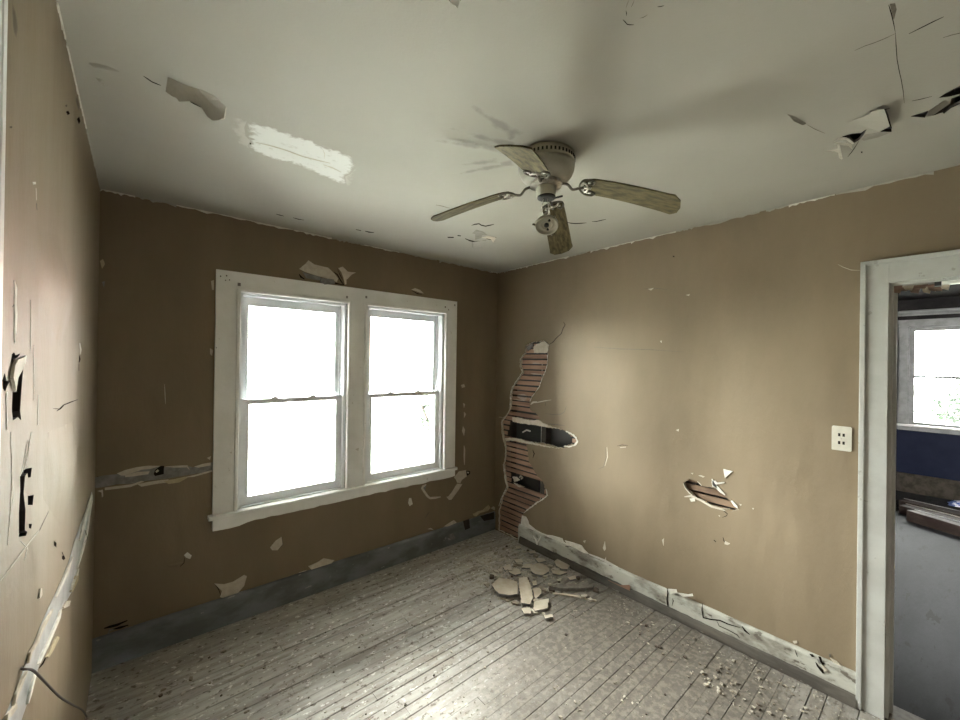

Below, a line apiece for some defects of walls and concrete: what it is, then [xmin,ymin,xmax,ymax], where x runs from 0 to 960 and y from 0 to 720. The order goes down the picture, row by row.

peeling [57,2,934,274]
flaking render [299,260,356,285]
flaking render [6,356,26,430]
flaking render [421,403,470,500]
flaking render [429,341,618,567]
flaking render [683,469,754,518]
peeling [3,456,213,720]
flaking render [215,575,247,598]